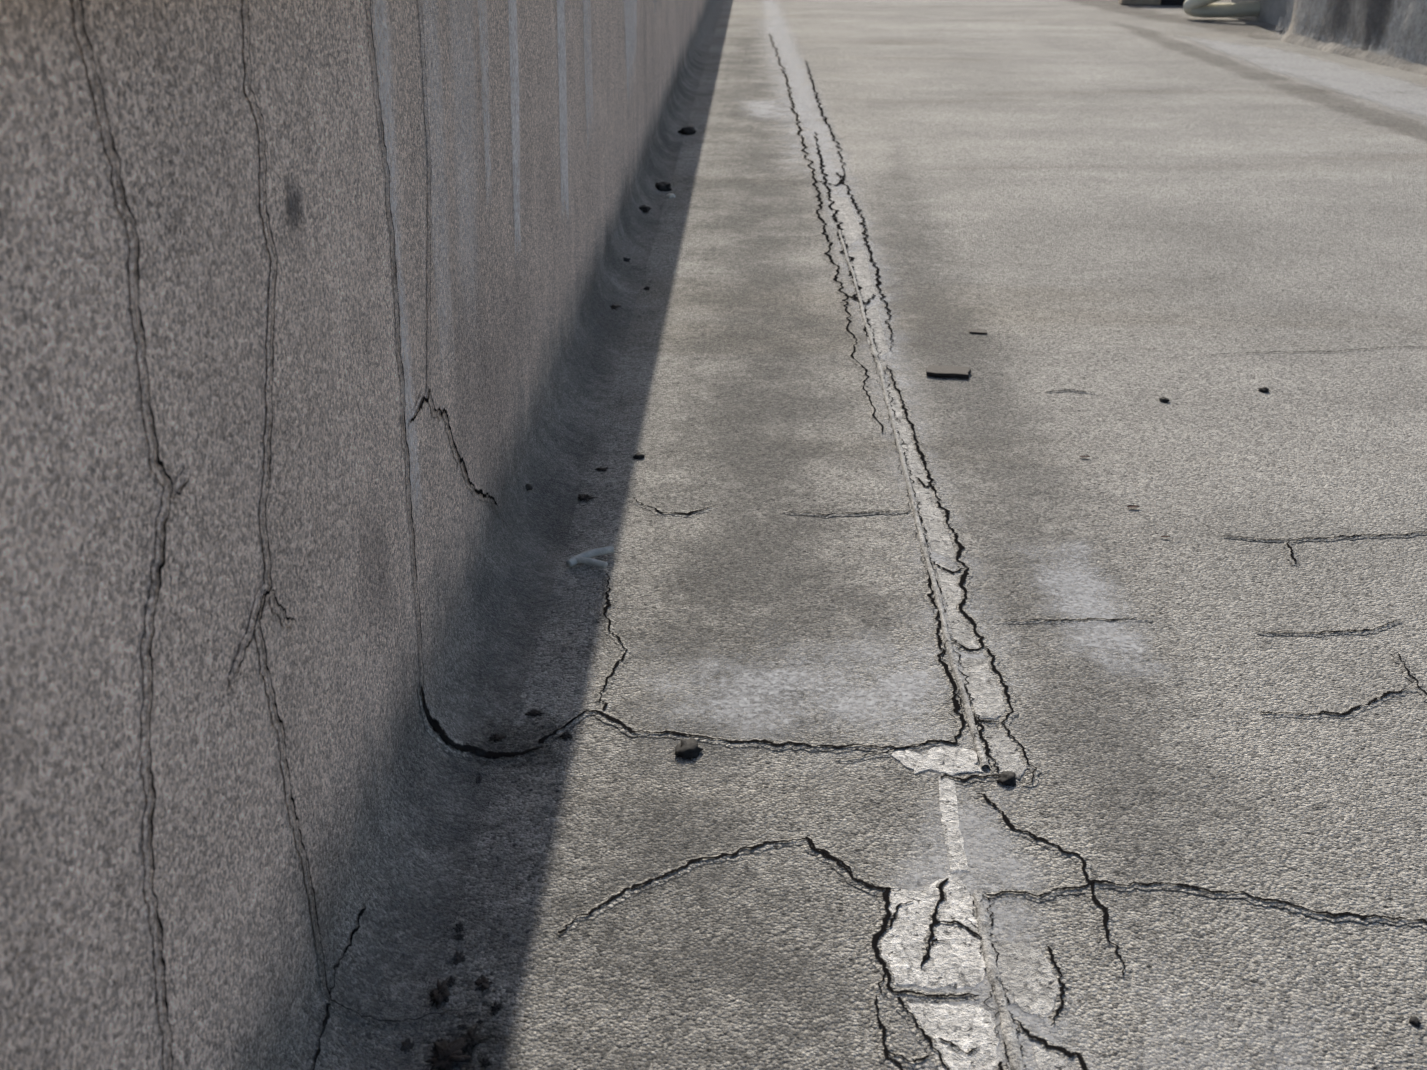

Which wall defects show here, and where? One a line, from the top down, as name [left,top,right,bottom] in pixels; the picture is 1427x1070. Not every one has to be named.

crack [72,0,191,1070]
crack [228,0,476,1070]
crack [366,0,1427,1070]
spalling [881,386,1059,1070]
spalling [1032,1045,1080,1070]